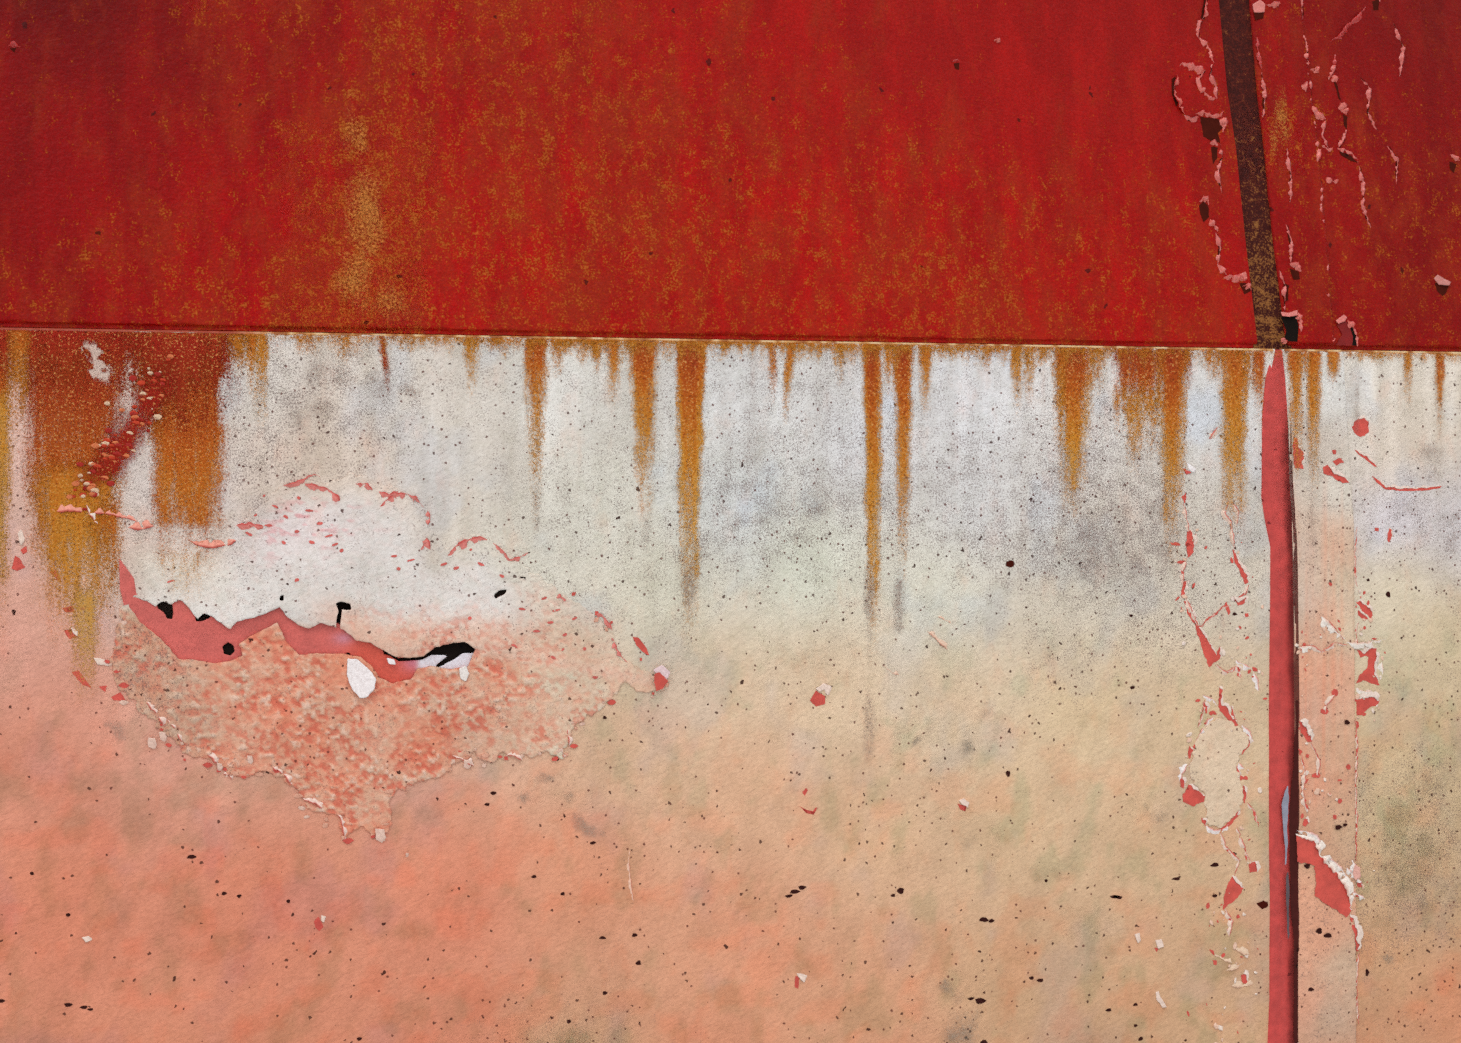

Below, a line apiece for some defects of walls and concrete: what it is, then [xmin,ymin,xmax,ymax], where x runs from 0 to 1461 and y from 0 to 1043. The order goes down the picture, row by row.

peeling [1172,38,1228,164]
peeling [1253,0,1281,69]
peeling [1302,0,1380,184]
corrosion [334,175,400,311]
peeling [1281,262,1303,344]
corrosion [0,330,1461,683]
peeling [1323,450,1349,483]
peeling [1352,415,1370,437]
peeling [1171,529,1264,691]
peeling [1177,686,1262,834]
peeling [1295,579,1385,951]
peeling [1209,854,1268,925]